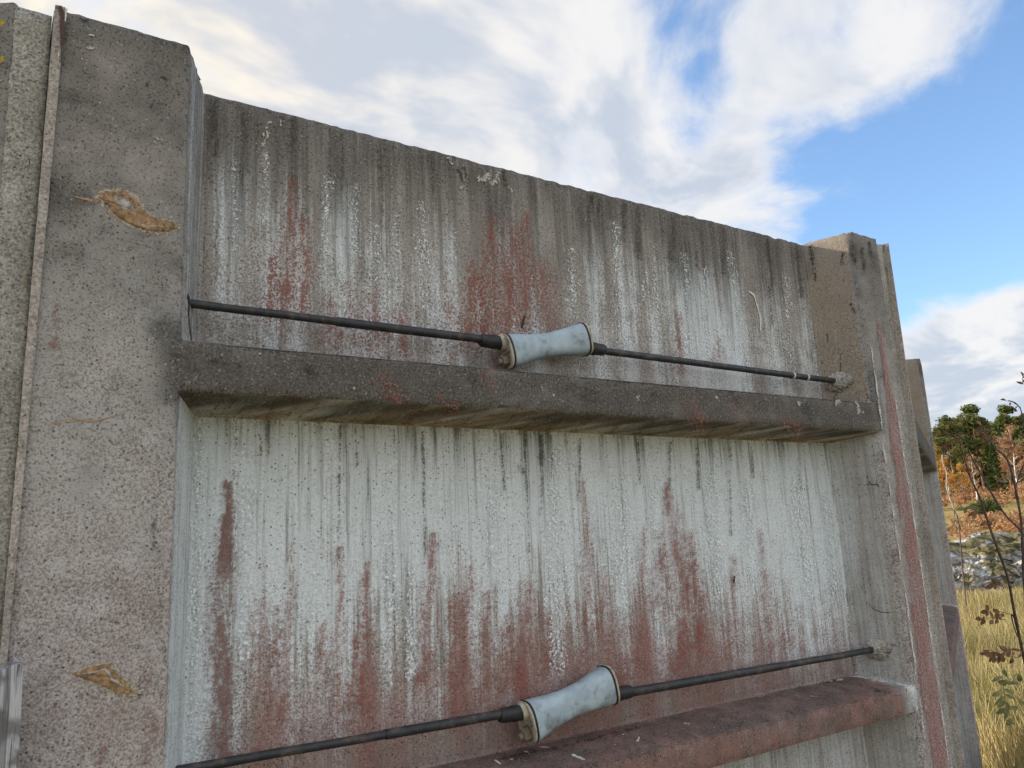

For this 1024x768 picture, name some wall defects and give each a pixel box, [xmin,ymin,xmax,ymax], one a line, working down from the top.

spalling [70,188,181,235]
leakage [264,118,409,361]
leakage [415,201,579,393]
leakage [612,203,720,374]
leakage [765,238,816,363]
leakage [307,377,796,739]
spalling [46,660,143,697]